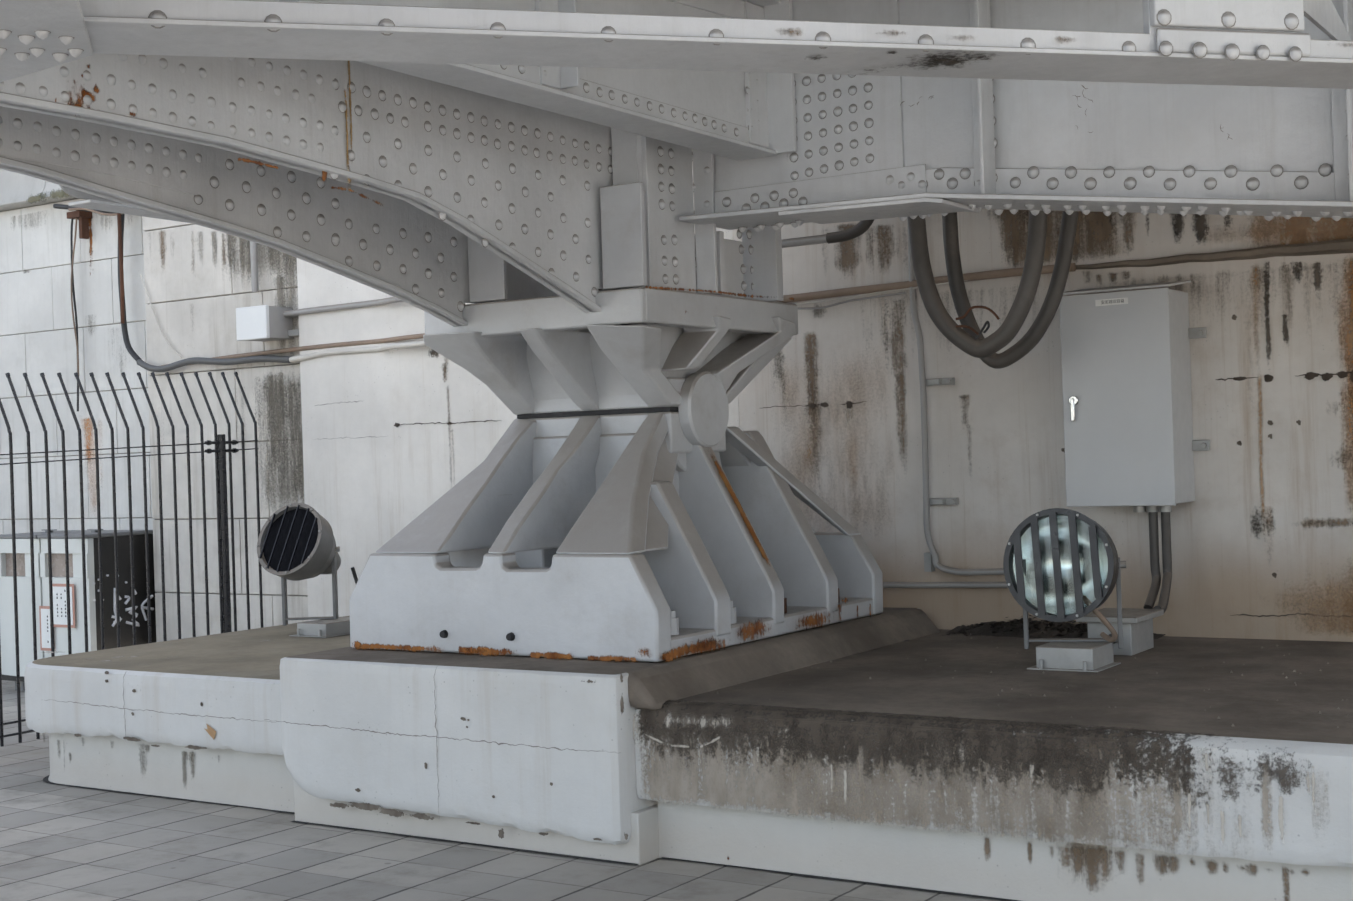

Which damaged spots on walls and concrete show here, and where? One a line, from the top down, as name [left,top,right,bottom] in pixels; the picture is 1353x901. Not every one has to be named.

corrosion [55,64,99,116]
corrosion [322,61,383,206]
damp [997,209,1029,266]
damp [1044,211,1149,261]
damp [1172,214,1209,242]
corrosion [1264,217,1353,245]
damp [199,232,297,346]
corrosion [354,641,441,652]
corrosion [458,646,512,656]
corrosion [588,620,770,662]
damp [633,700,1318,889]
damp [1282,868,1308,901]